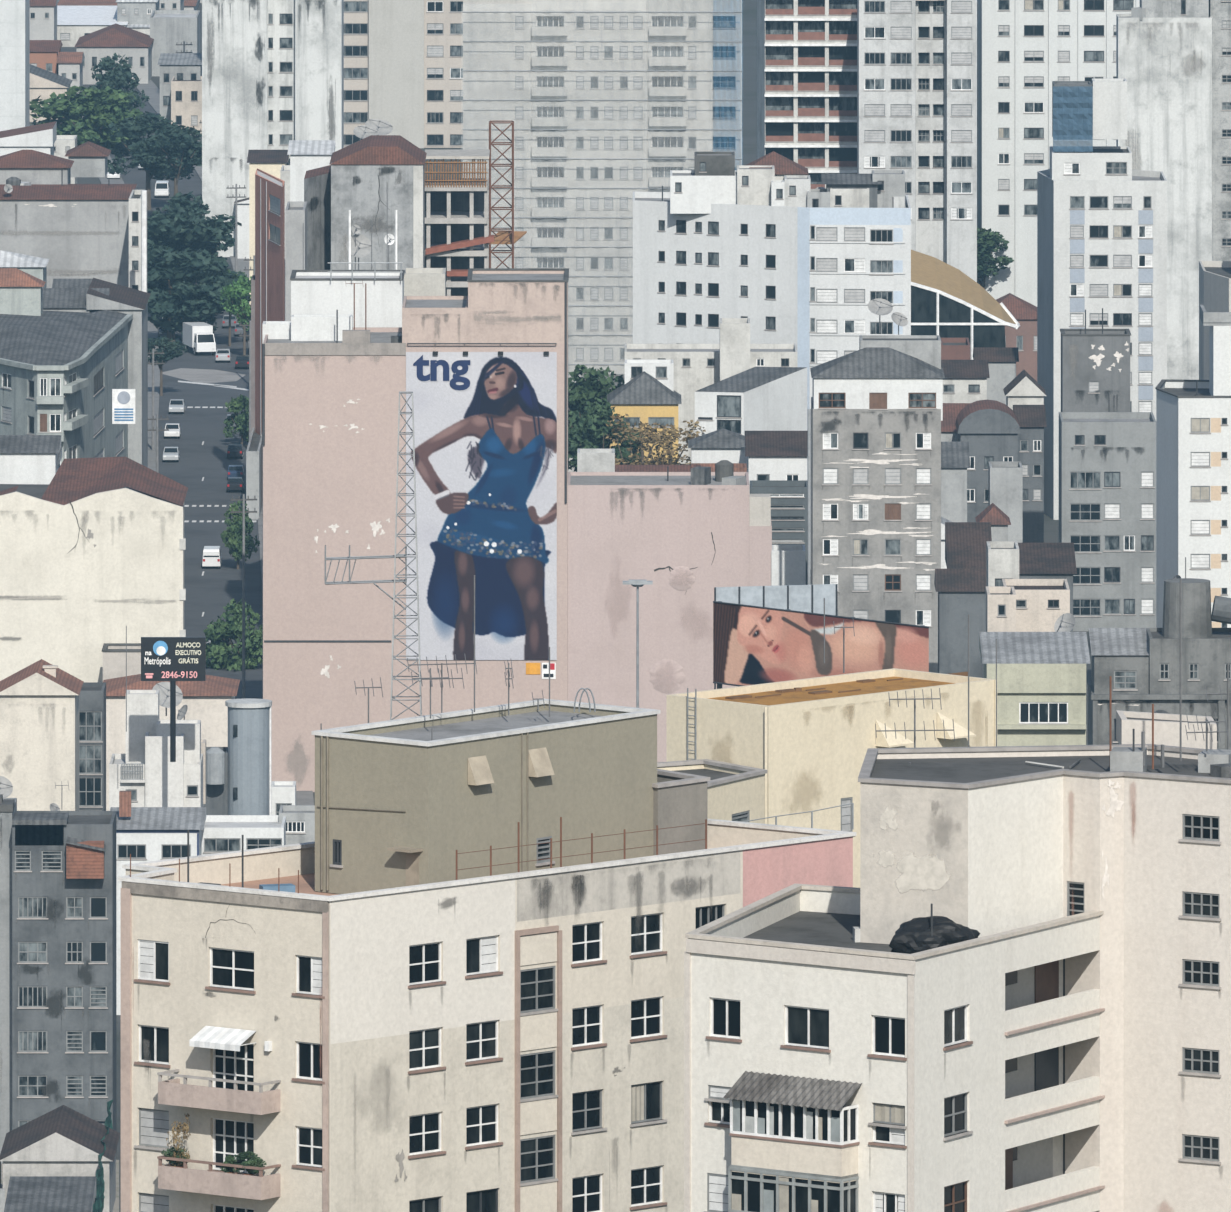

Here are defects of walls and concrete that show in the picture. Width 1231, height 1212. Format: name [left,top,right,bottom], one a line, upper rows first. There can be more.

flaking render [1088,341,1129,372]
crack [67,500,90,554]
peeling [367,519,390,549]
damp [573,875,584,903]